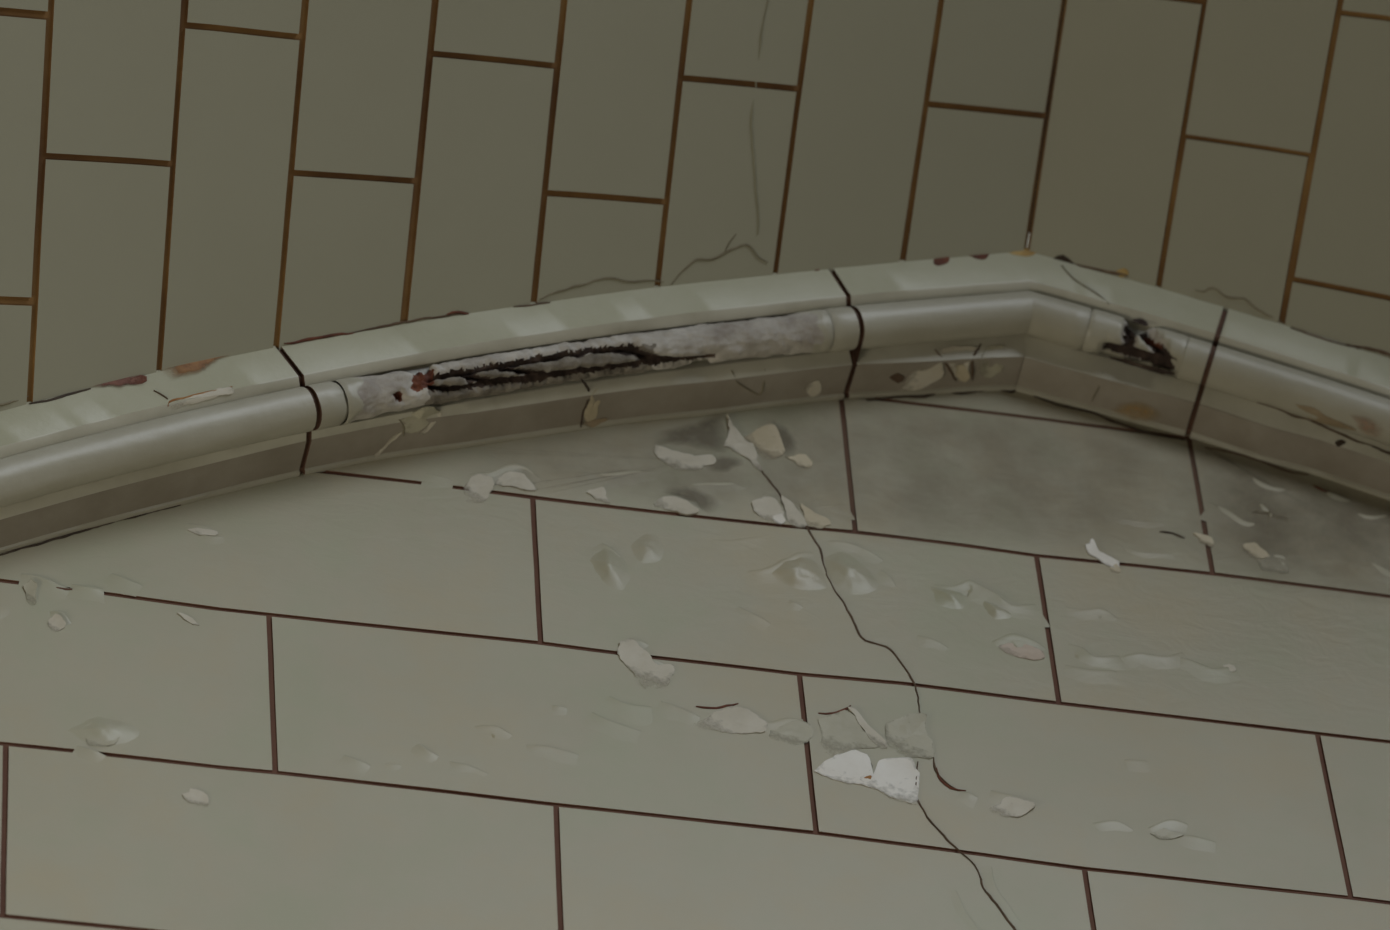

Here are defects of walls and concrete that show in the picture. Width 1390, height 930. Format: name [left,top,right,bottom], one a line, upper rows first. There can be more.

spalling [334,310,833,457]
peeling [576,414,855,528]
crack [758,465,781,498]
spalling [867,343,1016,401]
spalling [1082,309,1189,375]
crack [1034,372,1309,475]
crack [1257,402,1390,455]
peeling [1085,538,1121,573]
peeling [617,638,675,684]
crack [805,525,920,713]
spalling [581,696,1036,818]
crack [915,757,1021,930]